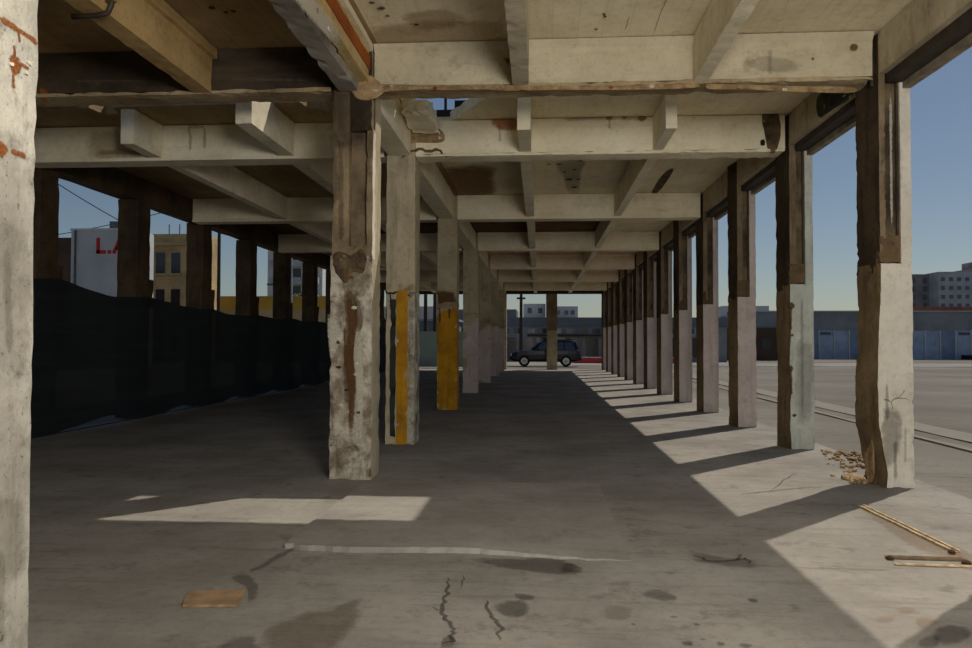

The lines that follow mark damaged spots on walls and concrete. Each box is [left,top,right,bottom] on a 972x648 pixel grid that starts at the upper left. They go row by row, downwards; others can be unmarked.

corrosion [0,17,38,88]
corrosion [0,141,26,158]